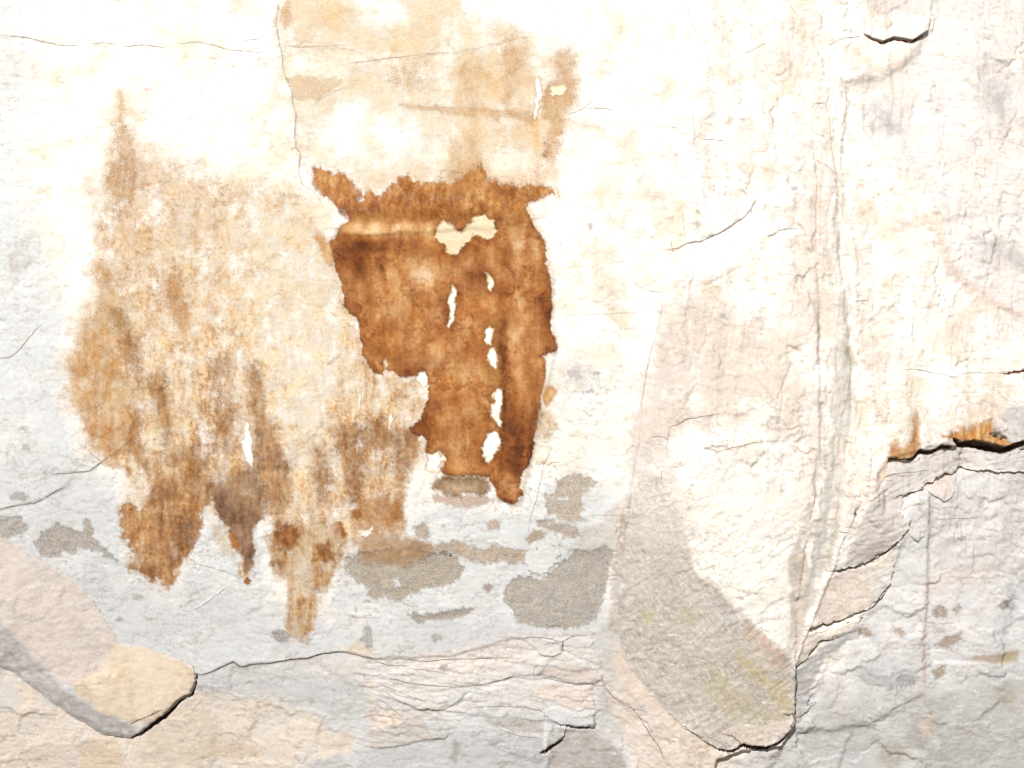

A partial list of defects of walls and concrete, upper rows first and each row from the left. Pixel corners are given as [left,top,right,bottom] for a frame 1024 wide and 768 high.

crack [835,35,924,44]
corrosion [65,0,580,639]
corrosion [880,415,921,478]
corrosion [942,412,1011,447]
spalling [345,473,613,630]
crack [801,587,889,663]
crack [830,436,1024,727]
crack [131,634,663,758]